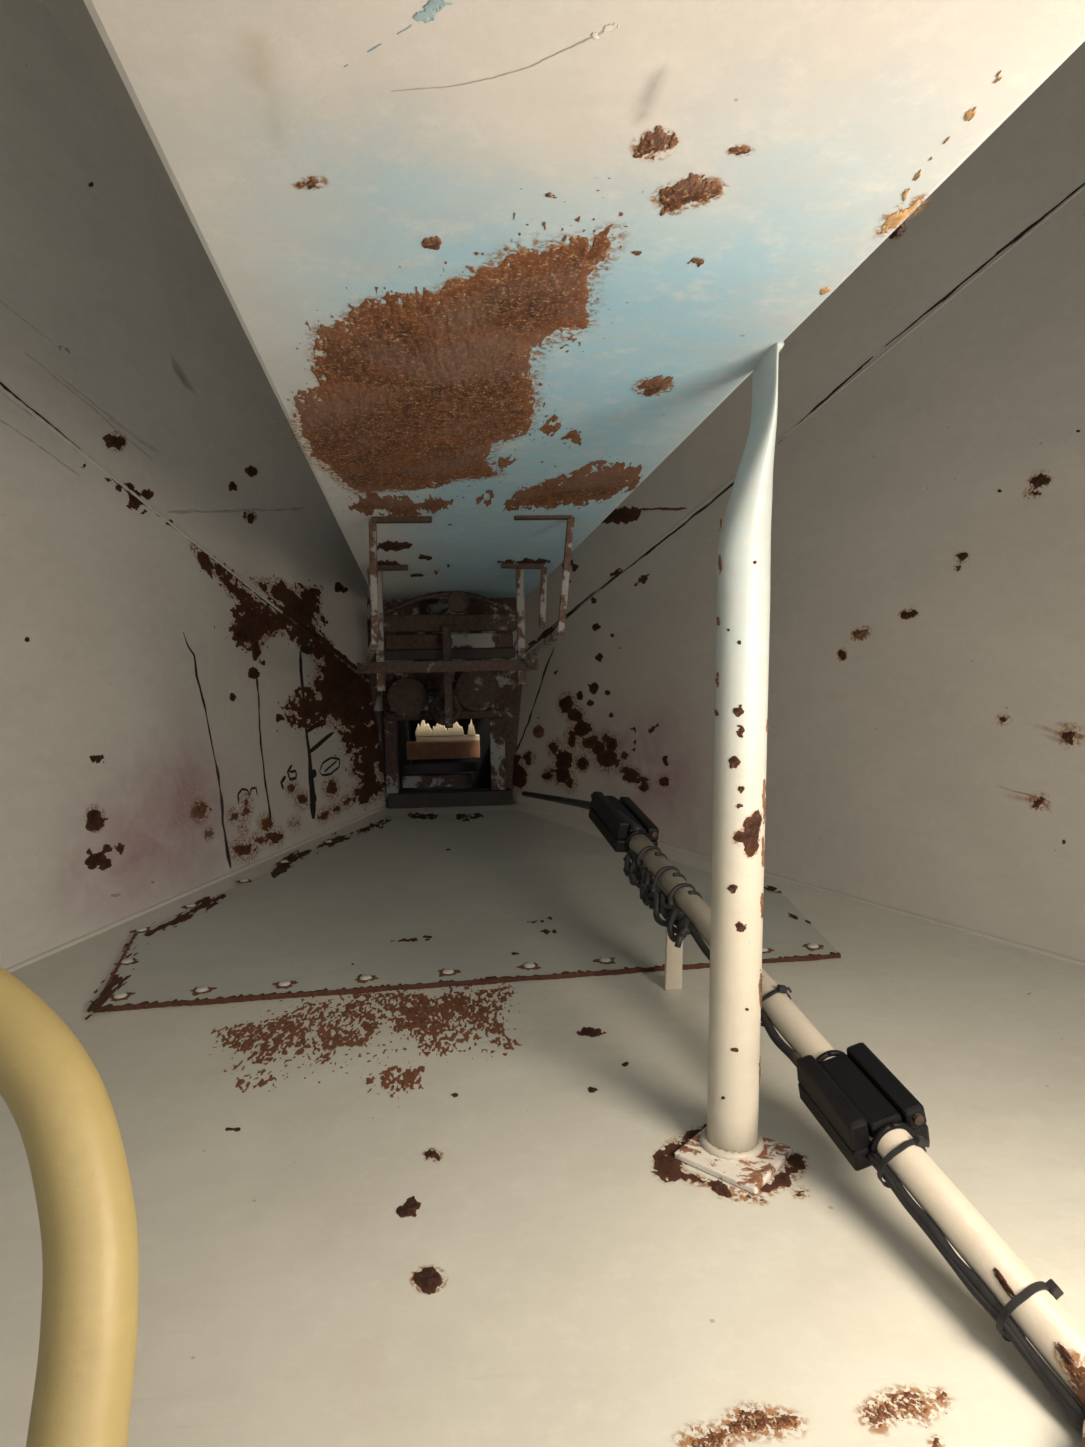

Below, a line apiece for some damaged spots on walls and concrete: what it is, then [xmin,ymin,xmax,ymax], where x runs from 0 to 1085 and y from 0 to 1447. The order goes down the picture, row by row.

rust [633,125,679,160]
rust [651,173,725,216]
rust [278,212,643,526]
rust [190,544,391,878]
rust [512,682,669,792]
rust [85,805,125,871]
rust [733,779,766,867]
rust [85,879,665,1099]
rust [651,1124,808,1204]
rust [410,1267,445,1295]
rust [678,1404,805,1447]
rust [858,1384,950,1447]